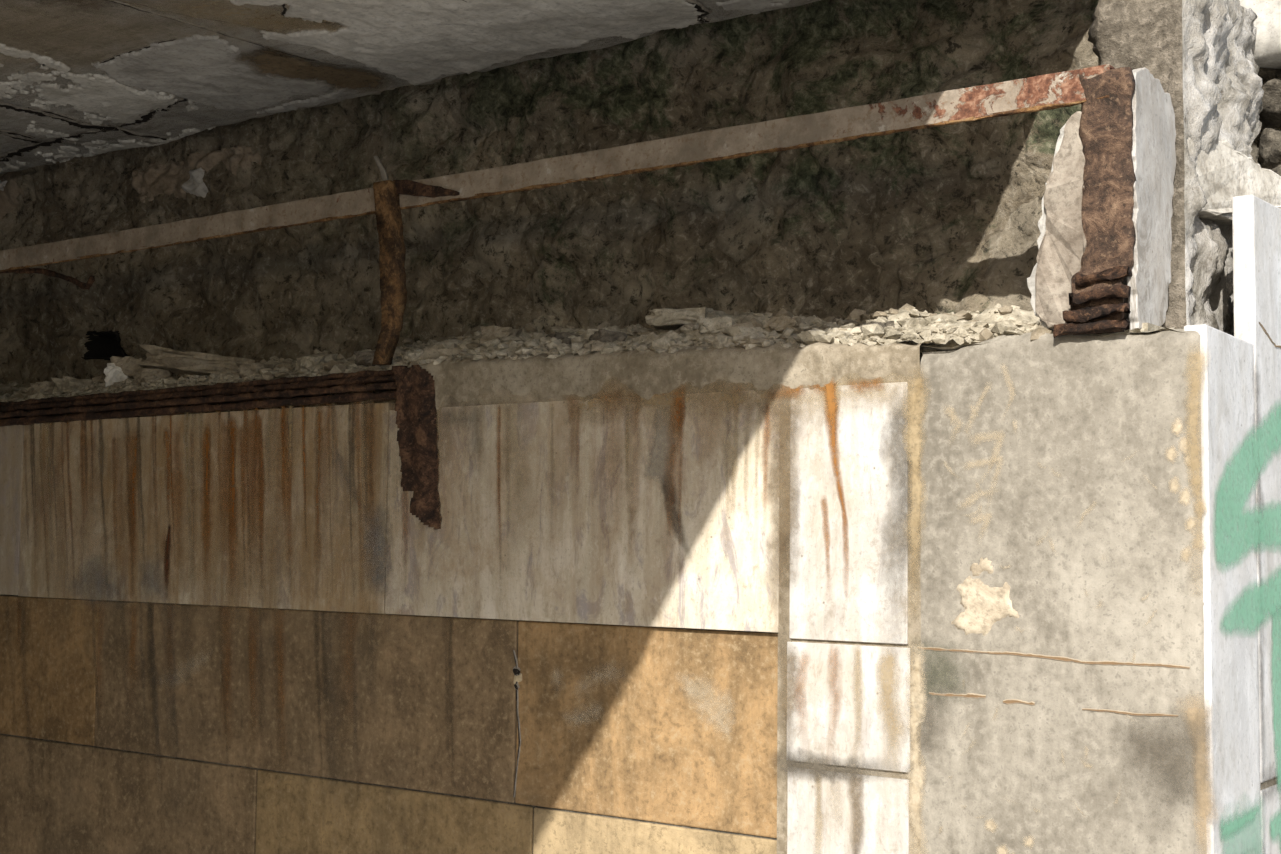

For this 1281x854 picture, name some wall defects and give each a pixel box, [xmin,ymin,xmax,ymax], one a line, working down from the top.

flaking render [0,43,262,220]
corrosion [393,94,1110,210]
crack [1259,322,1281,348]
corrosion [31,419,115,541]
corrosion [131,404,210,582]
corrosion [282,384,374,546]
corrosion [598,388,685,452]
corrosion [817,382,847,551]
spalling [951,558,1020,636]
corrosion [851,777,862,854]